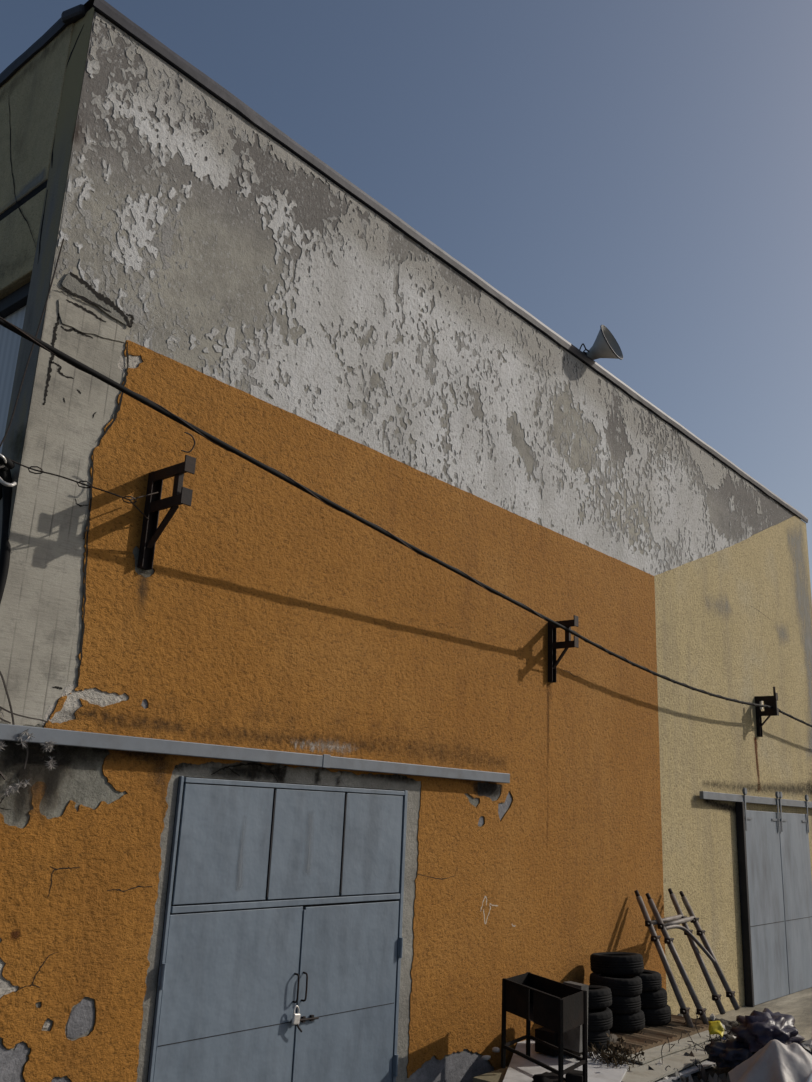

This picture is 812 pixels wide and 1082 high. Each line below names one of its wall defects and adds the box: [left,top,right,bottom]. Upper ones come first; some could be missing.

crack [9,106,55,260]
peeling [46,11,794,571]
crack [43,272,134,690]
spalling [22,684,129,728]
spalling [0,740,127,828]
spalling [465,782,512,826]
peeling [0,958,19,998]
spalling [67,999,94,1038]
spalling [0,1043,28,1082]